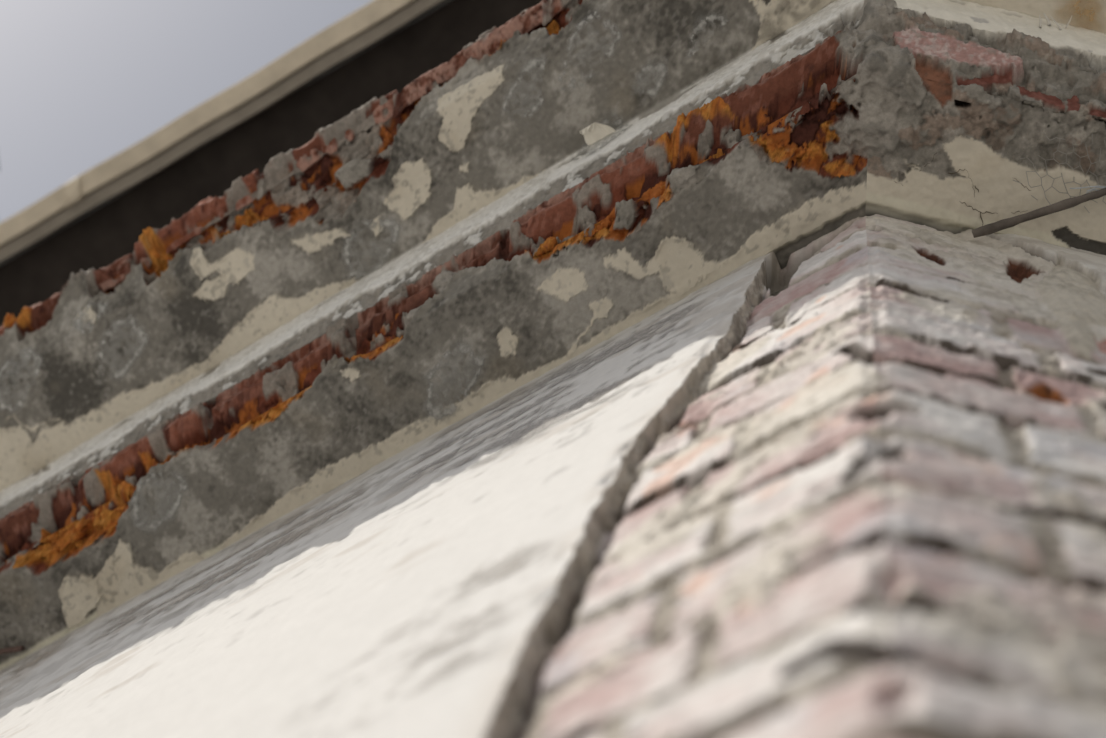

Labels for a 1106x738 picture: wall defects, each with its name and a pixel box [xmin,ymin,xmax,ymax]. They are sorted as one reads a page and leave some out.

peeling [59,181,867,738]
spalling [0,0,1106,575]